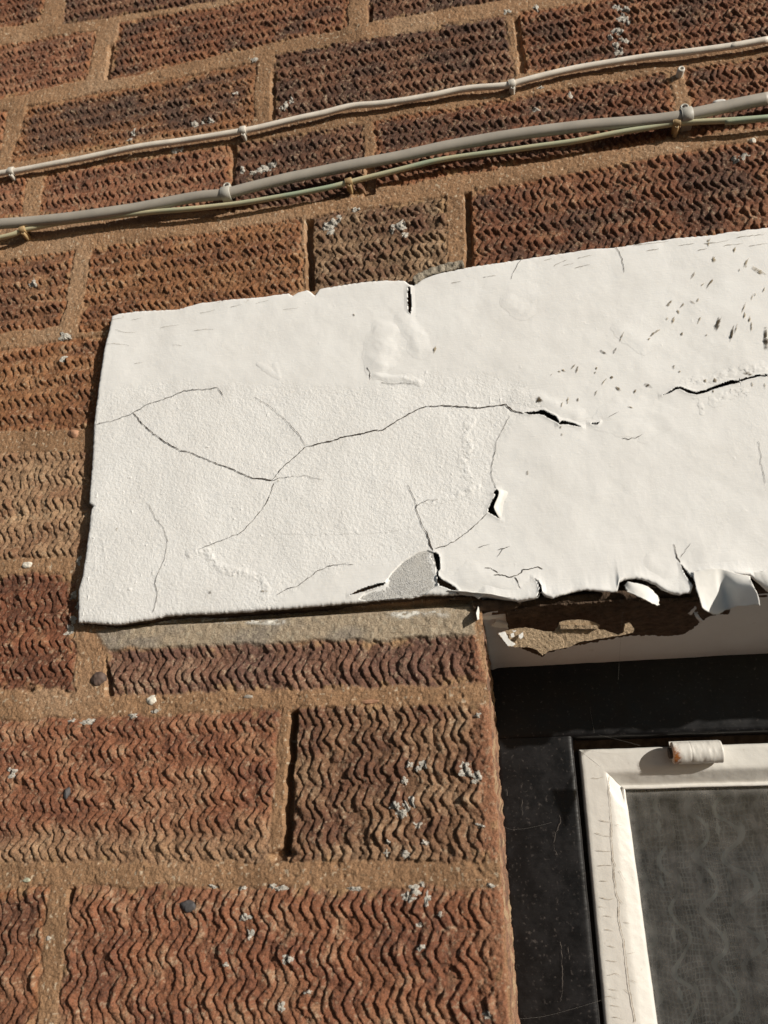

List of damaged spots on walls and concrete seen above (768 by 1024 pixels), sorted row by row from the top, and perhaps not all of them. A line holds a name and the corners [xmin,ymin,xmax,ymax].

crack [663,376,758,395]
crack [93,387,614,549]
crack [408,486,542,601]
spalling [360,551,768,657]